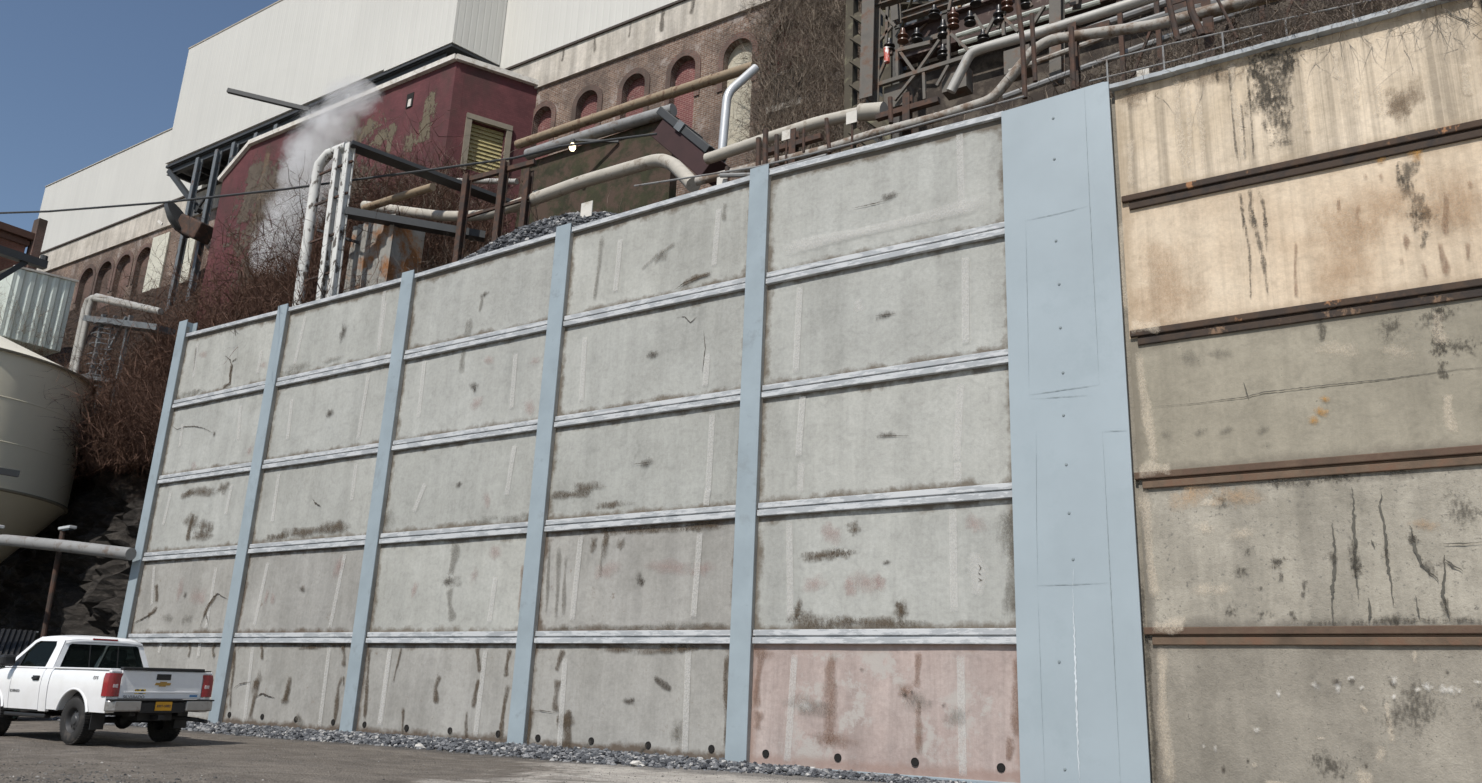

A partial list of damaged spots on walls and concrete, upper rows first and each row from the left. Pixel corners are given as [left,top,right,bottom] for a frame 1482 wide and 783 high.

leakage [1201,48,1296,156]
leakage [1240,192,1268,297]
leakage [1397,163,1431,246]
crack [1154,368,1473,407]